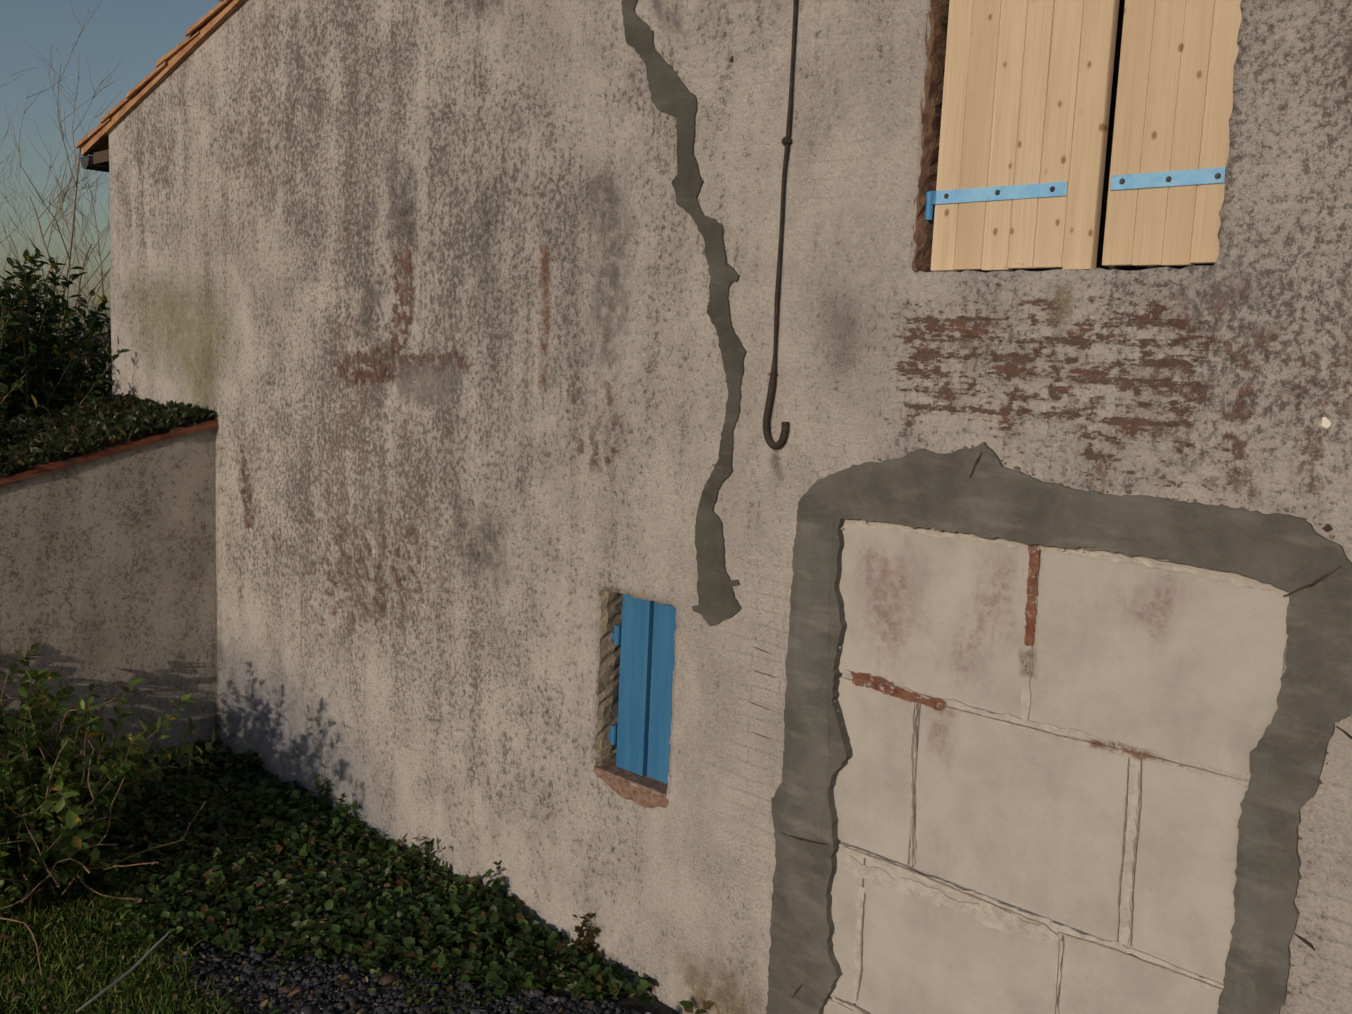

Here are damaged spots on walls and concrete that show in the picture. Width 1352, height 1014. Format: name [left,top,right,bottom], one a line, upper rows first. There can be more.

crack [621,0,747,627]
peeling [884,266,1273,506]
peeling [1305,362,1347,478]
crack [748,646,775,739]